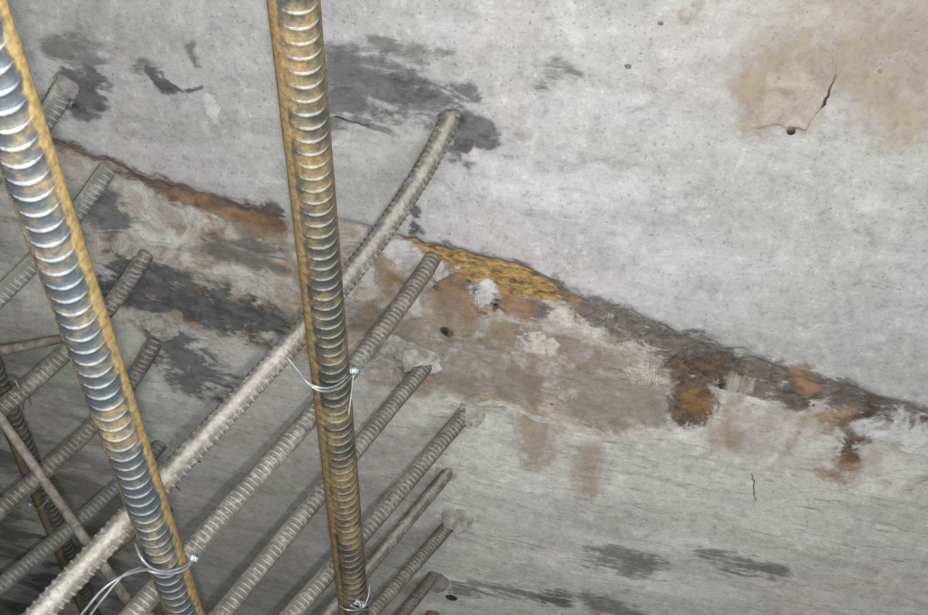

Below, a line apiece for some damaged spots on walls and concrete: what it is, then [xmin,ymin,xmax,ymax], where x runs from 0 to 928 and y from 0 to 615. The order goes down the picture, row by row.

damp [325,37,500,167]
crack [751,48,837,132]
corrosion [53,140,287,233]
corrosion [454,139,473,153]
spalling [0,0,673,615]
corrosion [406,237,584,322]
corrosion [661,351,738,428]
corrosion [785,364,823,406]
corrosion [818,397,891,483]